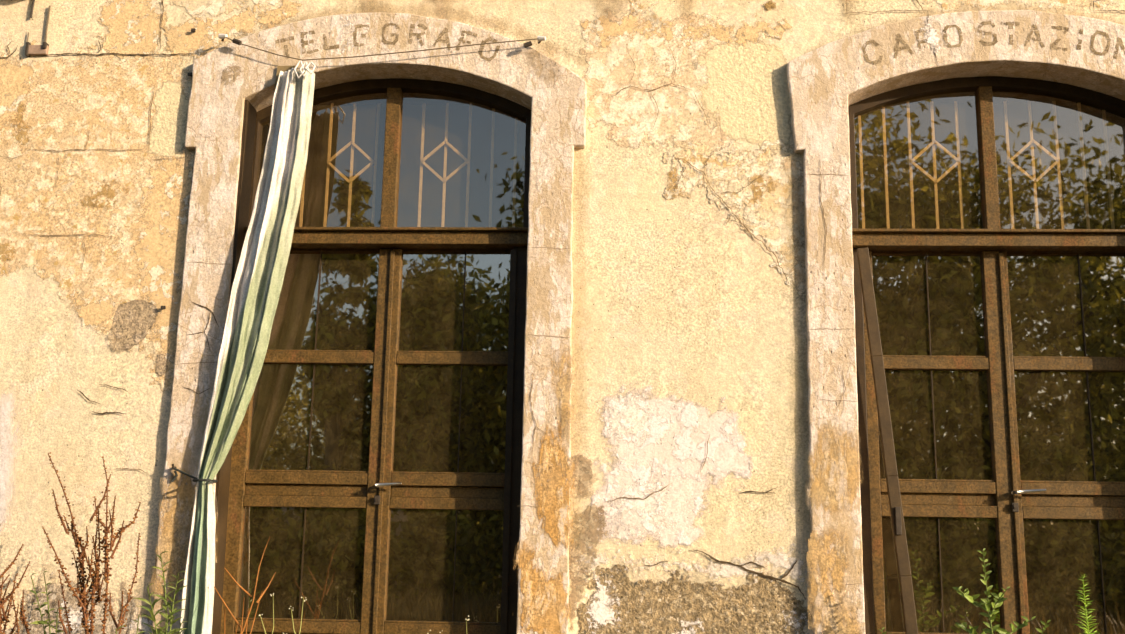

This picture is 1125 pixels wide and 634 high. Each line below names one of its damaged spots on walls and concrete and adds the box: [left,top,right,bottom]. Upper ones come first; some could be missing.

peeling [0,0,301,392]
peeling [580,0,806,300]
crack [614,50,789,283]
flaking render [591,385,753,547]
flaking render [577,564,812,634]
crack [644,550,806,600]